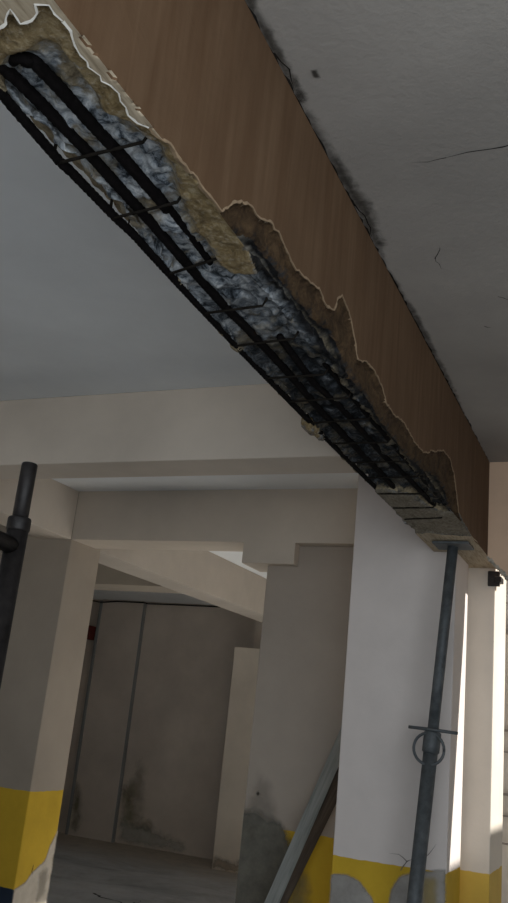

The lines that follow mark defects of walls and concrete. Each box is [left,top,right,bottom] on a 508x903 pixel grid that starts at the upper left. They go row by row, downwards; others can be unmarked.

crack [414,145,508,163]
crack [270,48,487,457]
spalling [0,3,471,536]
water stain [213,811,290,903]
peeling [330,874,373,903]
peeling [389,874,410,903]
peeling [422,870,445,903]